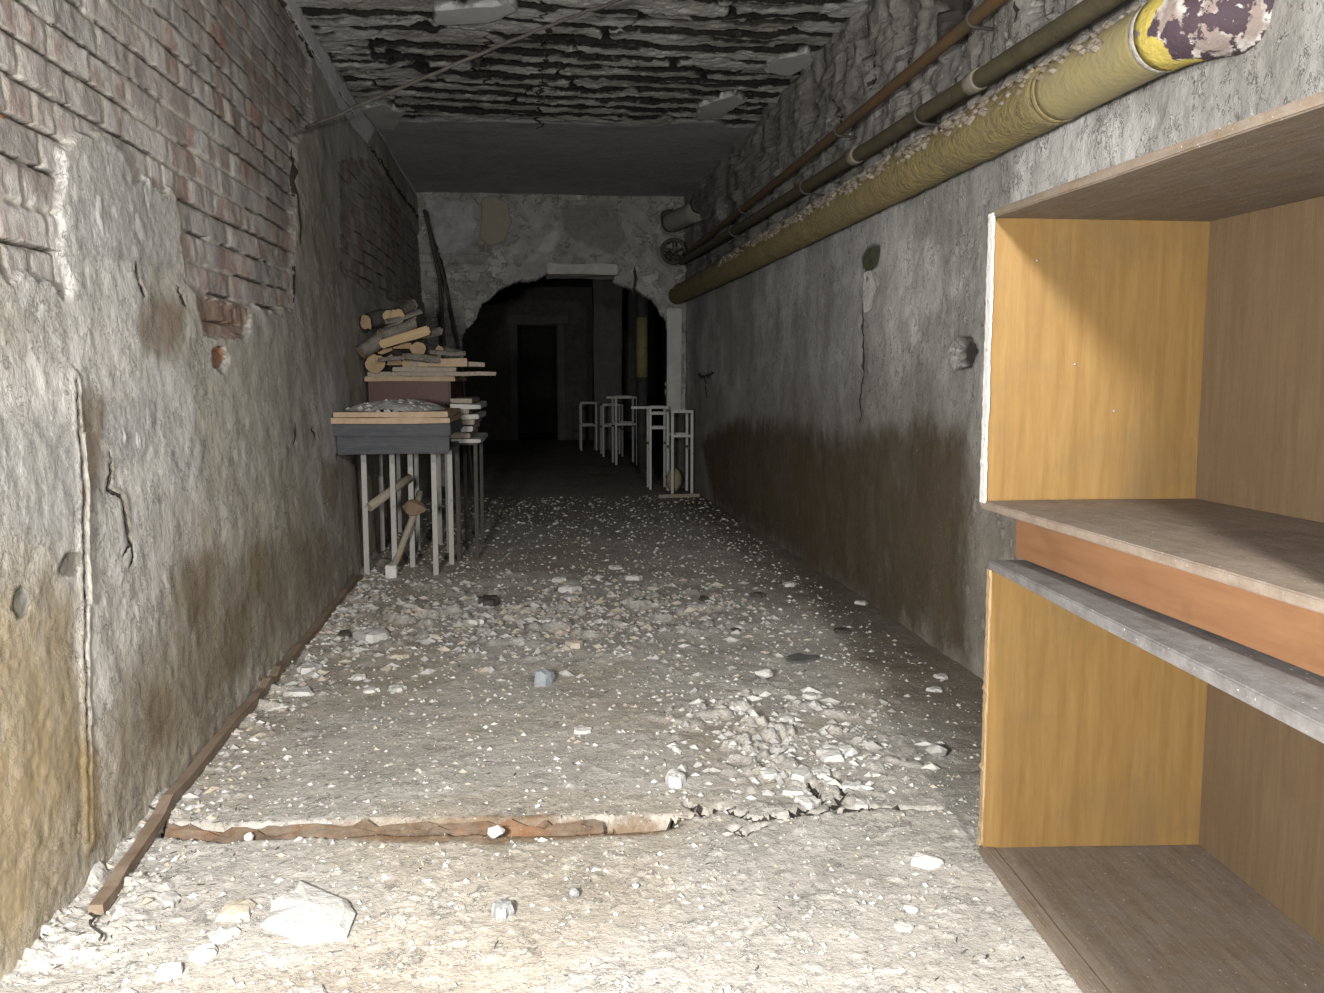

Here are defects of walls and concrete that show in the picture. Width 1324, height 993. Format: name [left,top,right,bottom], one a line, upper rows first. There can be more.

crack [466,35,495,84]
crack [531,4,553,130]
crack [867,49,877,90]
crack [829,96,843,124]
peeling [76,138,179,265]
spalling [197,296,248,368]
peeling [0,431,81,577]
spalling [13,586,33,618]
crack [76,380,134,787]
water stain [0,627,83,930]
rust [336,815,680,844]
crack [649,779,900,837]